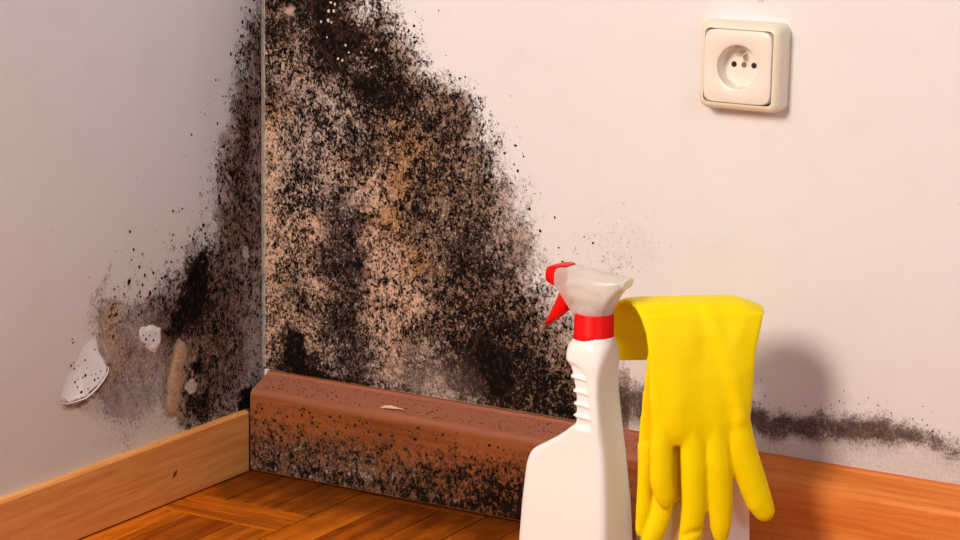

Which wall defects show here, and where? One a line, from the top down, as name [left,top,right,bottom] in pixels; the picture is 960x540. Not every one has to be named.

damp [66,0,577,520]
peeling [60,338,109,404]
peeling [139,325,161,353]
damp [618,362,644,450]
damp [751,390,958,455]